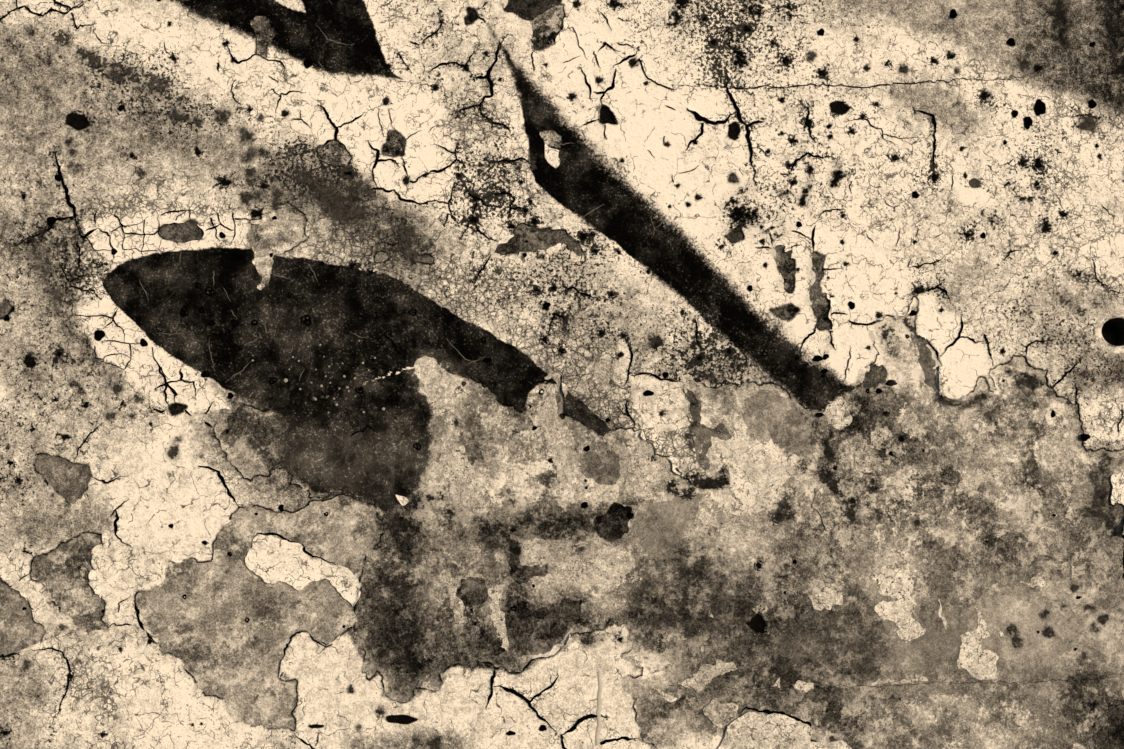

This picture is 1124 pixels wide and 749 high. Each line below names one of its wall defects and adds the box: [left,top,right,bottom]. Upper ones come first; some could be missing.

crack [0,0,110,44]
peeling [466,9,478,24]
peeling [492,0,581,49]
crack [217,0,524,278]
crack [497,157,532,171]
crack [560,10,1023,270]
peeling [31,454,91,510]
peeling [135,286,1124,749]
peeling [0,533,108,655]
crack [486,671,640,749]